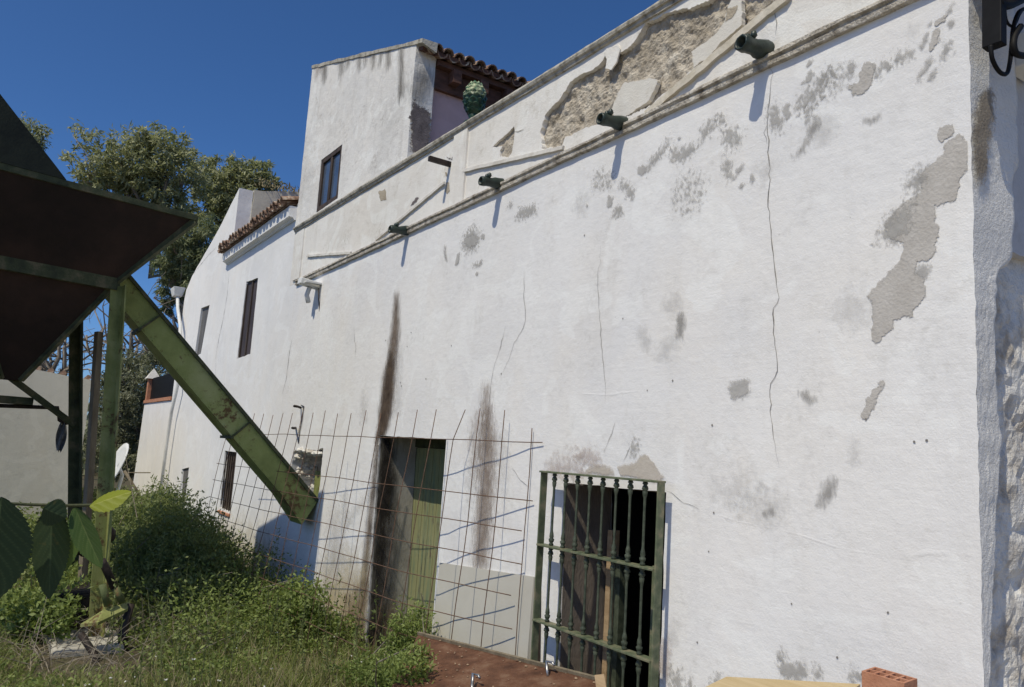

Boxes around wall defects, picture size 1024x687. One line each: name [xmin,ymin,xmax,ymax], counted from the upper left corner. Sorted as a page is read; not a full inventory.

spalling [544,0,775,148]
crack [764,70,779,449]
peeling [867,88,996,343]
water stain [325,293,400,650]
peeling [550,442,663,481]
peeling [861,380,885,421]